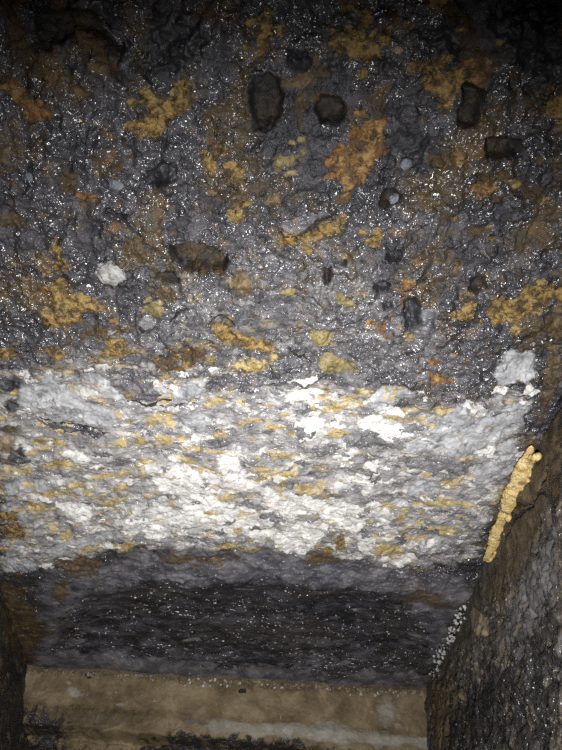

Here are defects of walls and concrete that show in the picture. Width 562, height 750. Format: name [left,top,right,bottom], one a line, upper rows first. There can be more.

rust [122,77,198,140]
rust [406,54,493,112]
peeling [281,208,331,234]
rust [270,109,390,255]
rust [34,236,137,363]
peeling [137,314,156,330]
rust [448,278,562,416]
leakage [0,220,562,750]